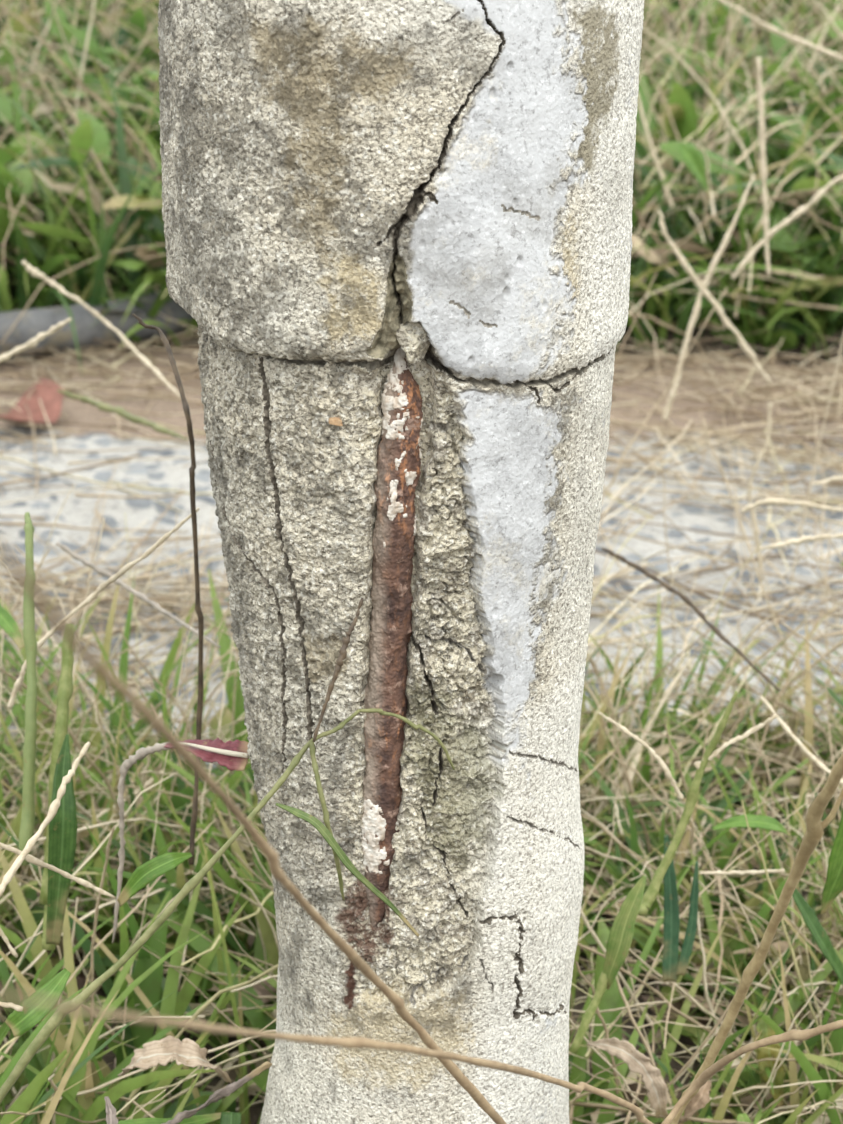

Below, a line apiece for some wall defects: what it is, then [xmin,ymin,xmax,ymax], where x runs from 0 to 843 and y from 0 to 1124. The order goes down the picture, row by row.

crack [210,0,611,773]
peeling [328,0,590,1000]
corrosion [331,862,404,1010]
crack [409,633,567,1022]
crack [506,815,580,849]